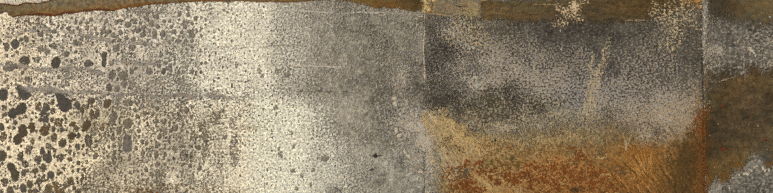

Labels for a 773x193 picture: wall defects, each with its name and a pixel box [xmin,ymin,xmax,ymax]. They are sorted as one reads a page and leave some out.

rust [0,0,328,17]
rust [339,0,423,13]
damp [0,0,414,193]
damp [369,0,773,193]
rust [418,85,743,193]